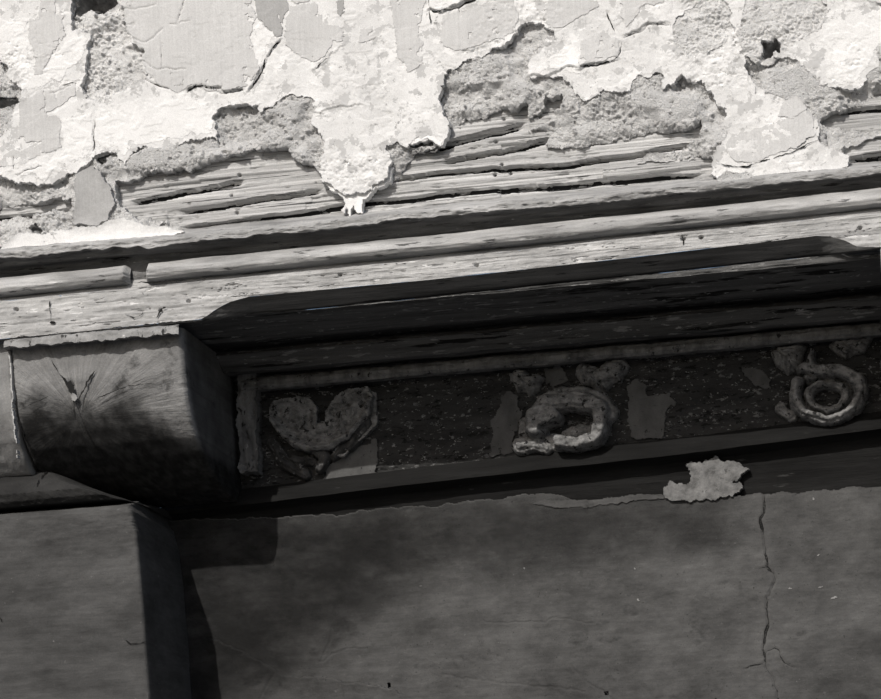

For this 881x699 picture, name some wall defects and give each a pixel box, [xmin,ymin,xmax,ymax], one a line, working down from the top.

crack [428,0,475,23]
crack [580,14,664,67]
crack [147,42,280,93]
flaking render [0,0,345,248]
flaking render [323,0,881,216]
flaking render [532,456,750,509]
crack [747,495,793,699]